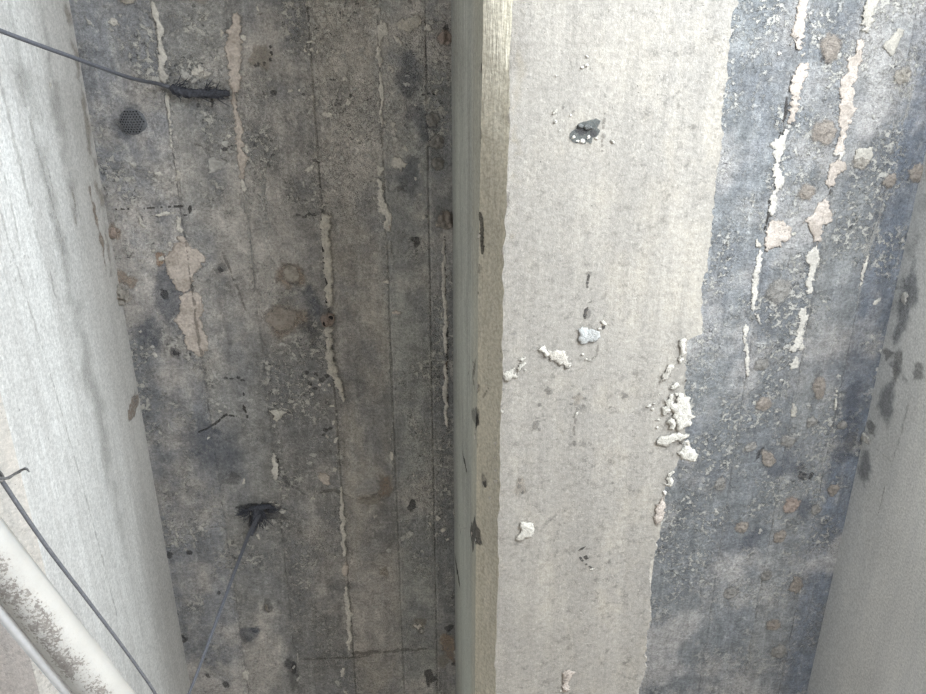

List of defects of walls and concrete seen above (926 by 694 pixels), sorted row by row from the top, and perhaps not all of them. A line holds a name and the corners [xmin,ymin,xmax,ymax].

spalling [882,28,905,56]
leakage [803,0,880,294]
spalling [853,146,874,162]
leakage [742,0,810,377]
peeling [151,215,209,358]
spalling [538,345,573,370]
spalling [578,307,607,362]
spalling [646,337,699,462]
spalling [653,471,675,524]
spalling [516,521,535,541]